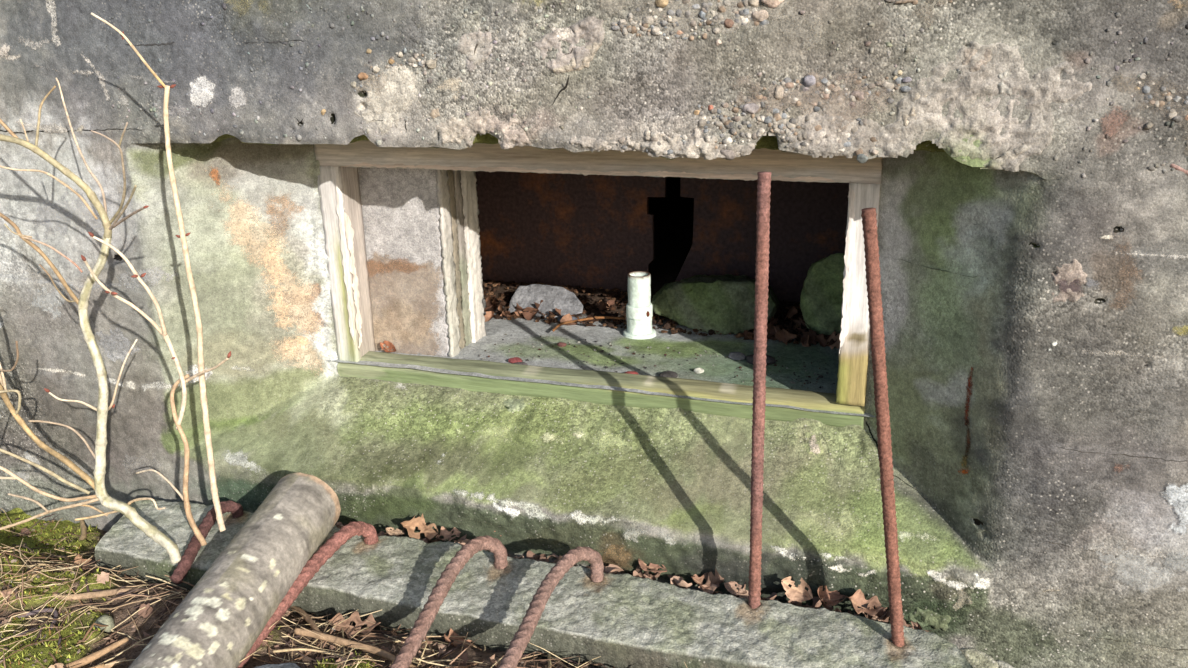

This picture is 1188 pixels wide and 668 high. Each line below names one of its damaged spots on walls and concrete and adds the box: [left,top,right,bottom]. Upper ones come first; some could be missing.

spalling [350,30,493,136]
peeling [980,144,1030,169]
spalling [336,70,951,647]
corrosion [958,367,973,474]
water stain [225,452,261,471]
water stain [543,432,626,448]
crack [865,420,916,490]
water stain [454,489,546,519]
water stain [563,511,617,524]
water stain [839,509,861,530]